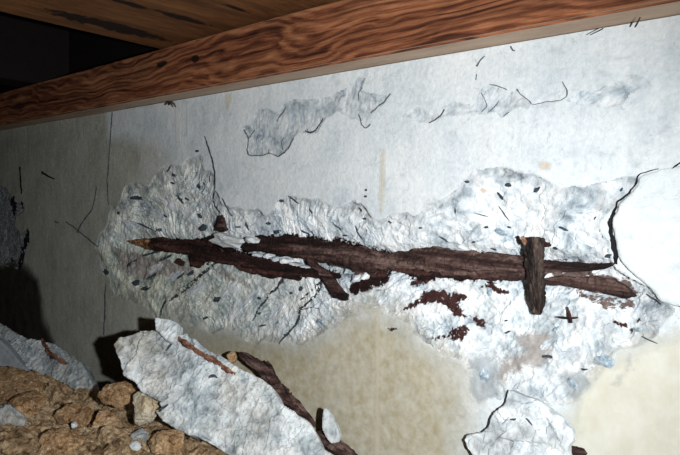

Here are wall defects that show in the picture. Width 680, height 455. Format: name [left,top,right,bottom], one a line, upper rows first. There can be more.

peeling [242,76,387,157]
crack [475,56,568,117]
crack [204,136,233,219]
rust [195,235,270,260]
crack [252,278,285,321]
crack [279,279,324,344]
rust [268,233,392,253]
spalling [95,150,675,405]
rust [349,270,509,341]
rust [552,271,641,310]
leakage [208,318,457,455]
leakage [562,335,680,455]